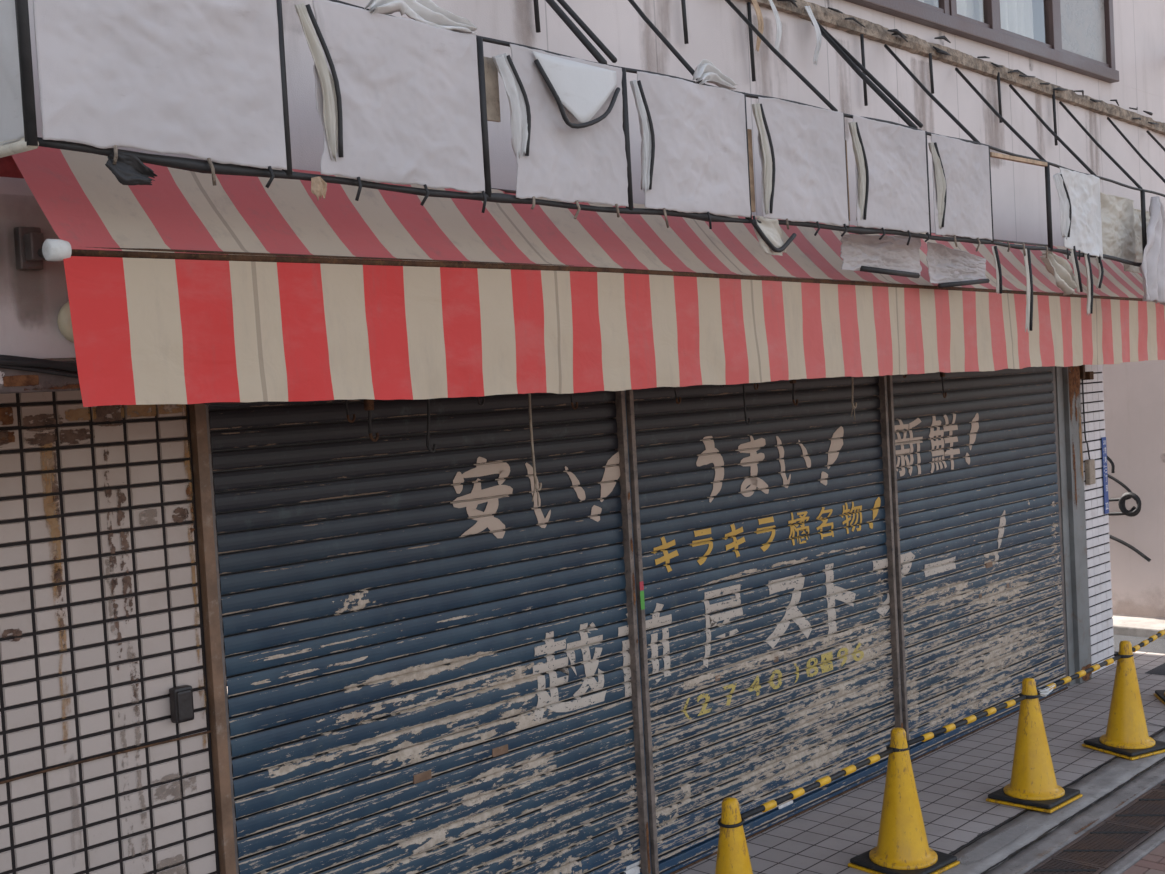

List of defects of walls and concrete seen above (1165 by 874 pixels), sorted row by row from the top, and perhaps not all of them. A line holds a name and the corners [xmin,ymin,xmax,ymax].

peeling [0,371,39,387]
corrosion [1068,366,1083,505]
corrosion [0,404,186,651]
peeling [254,632,384,661]
peeling [332,589,380,616]
peeling [251,651,553,791]
peeling [655,568,893,843]
peeling [700,546,865,587]
peeling [908,575,1033,613]
peeling [906,620,1054,731]
peeling [353,751,594,874]
peeling [608,823,640,874]